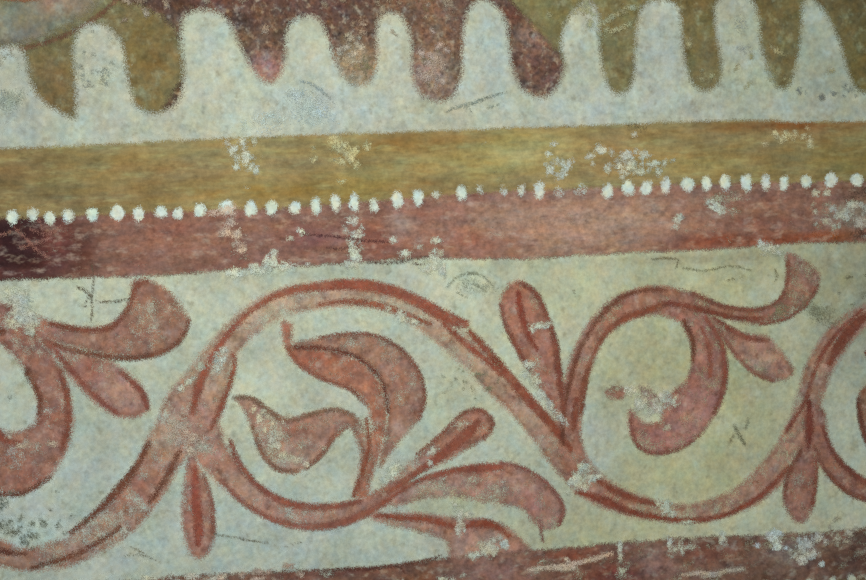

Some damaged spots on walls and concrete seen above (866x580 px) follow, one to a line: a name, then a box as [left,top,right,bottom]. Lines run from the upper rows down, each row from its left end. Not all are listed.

peeling [543,132,675,181]
peeling [810,189,866,236]